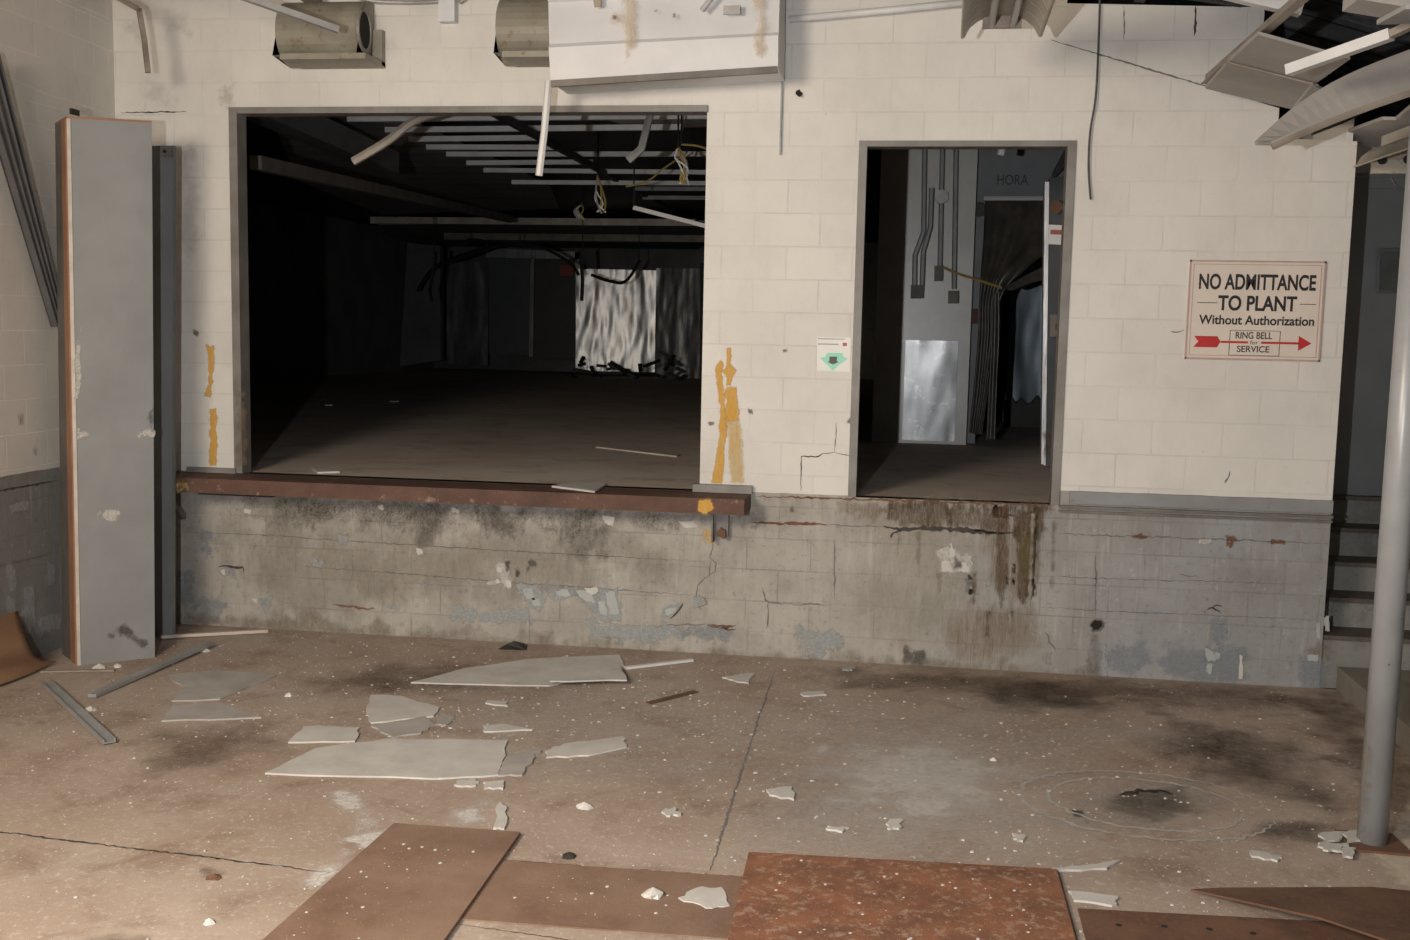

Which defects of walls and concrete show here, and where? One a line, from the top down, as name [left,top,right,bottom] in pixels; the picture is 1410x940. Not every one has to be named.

damp [363,502,527,555]
damp [565,514,615,556]
damp [635,512,697,528]
peeling [936,535,973,574]
peeling [487,562,622,623]
crack [639,672,775,876]
damp [1016,732,1313,842]